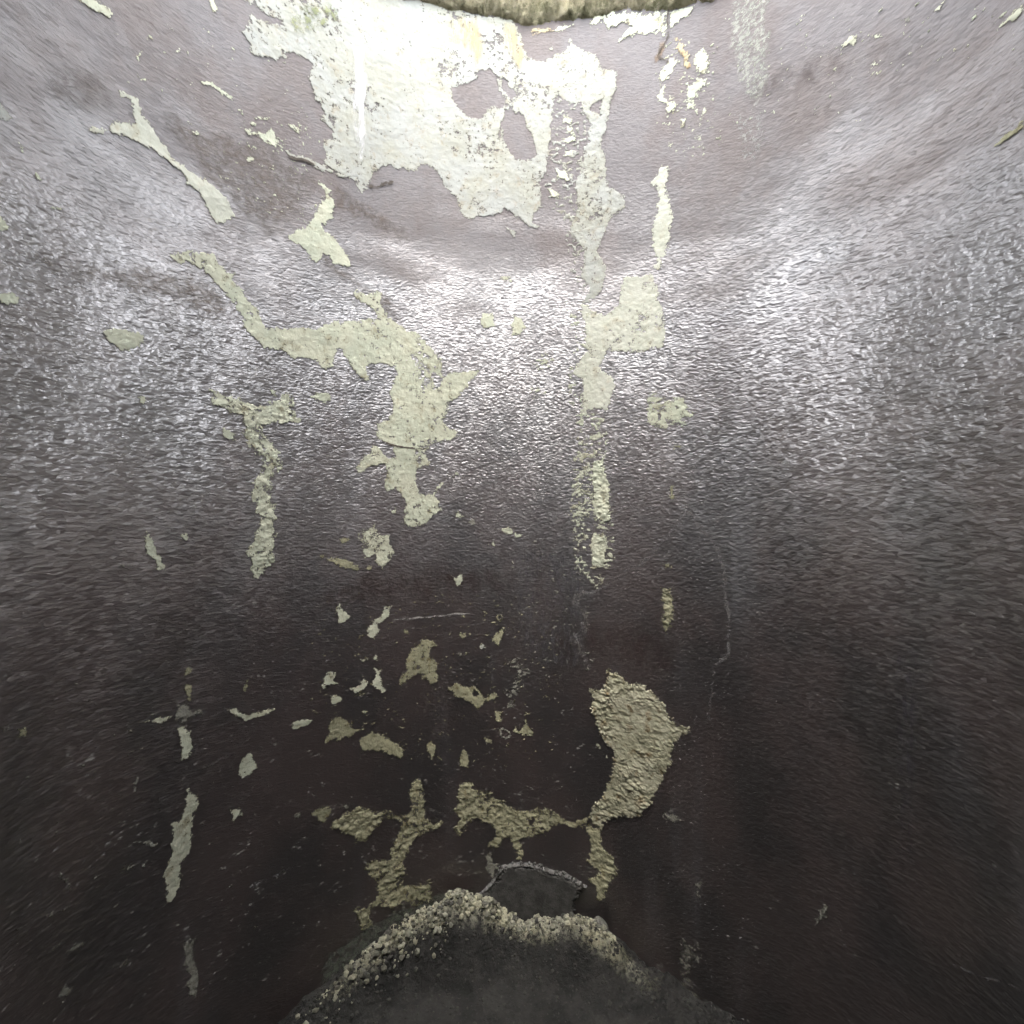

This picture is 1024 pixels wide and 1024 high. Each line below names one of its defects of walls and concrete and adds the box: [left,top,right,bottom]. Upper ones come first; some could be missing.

peeling [80,0,113,18]
peeling [589,5,721,157]
peeling [88,0,694,930]
peeling [176,938,206,1009]
peeling [677,938,702,1000]